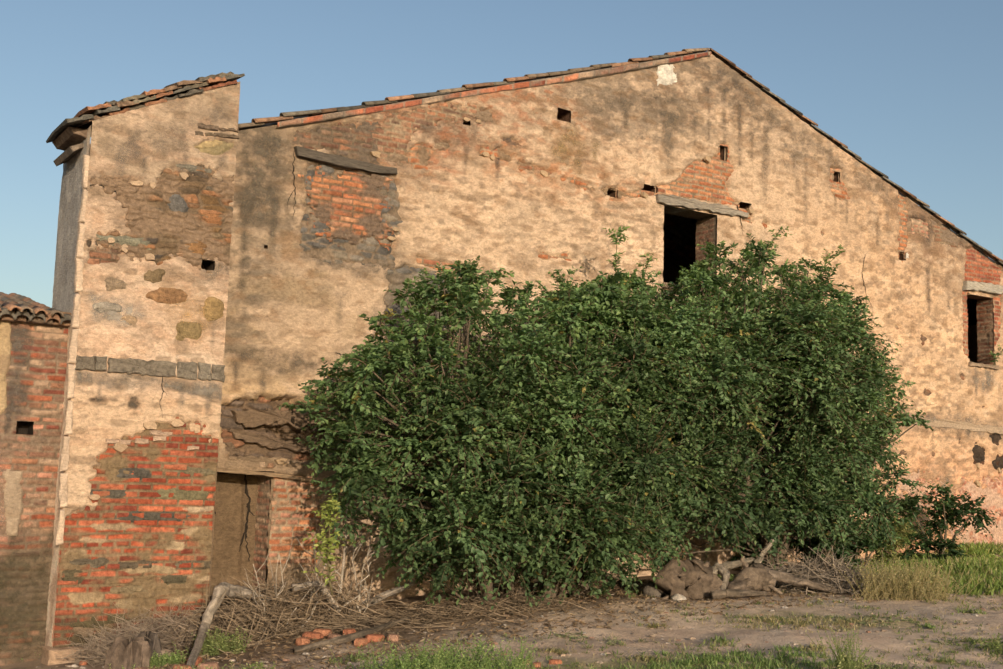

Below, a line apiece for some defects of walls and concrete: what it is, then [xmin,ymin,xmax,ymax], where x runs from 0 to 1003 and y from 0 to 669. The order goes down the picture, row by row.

spalling [87,140,234,273]
flaking render [292,102,493,377]
flaking render [478,144,767,229]
flaking render [898,194,1002,356]
flaking render [52,417,219,648]
crack [239,474,255,561]